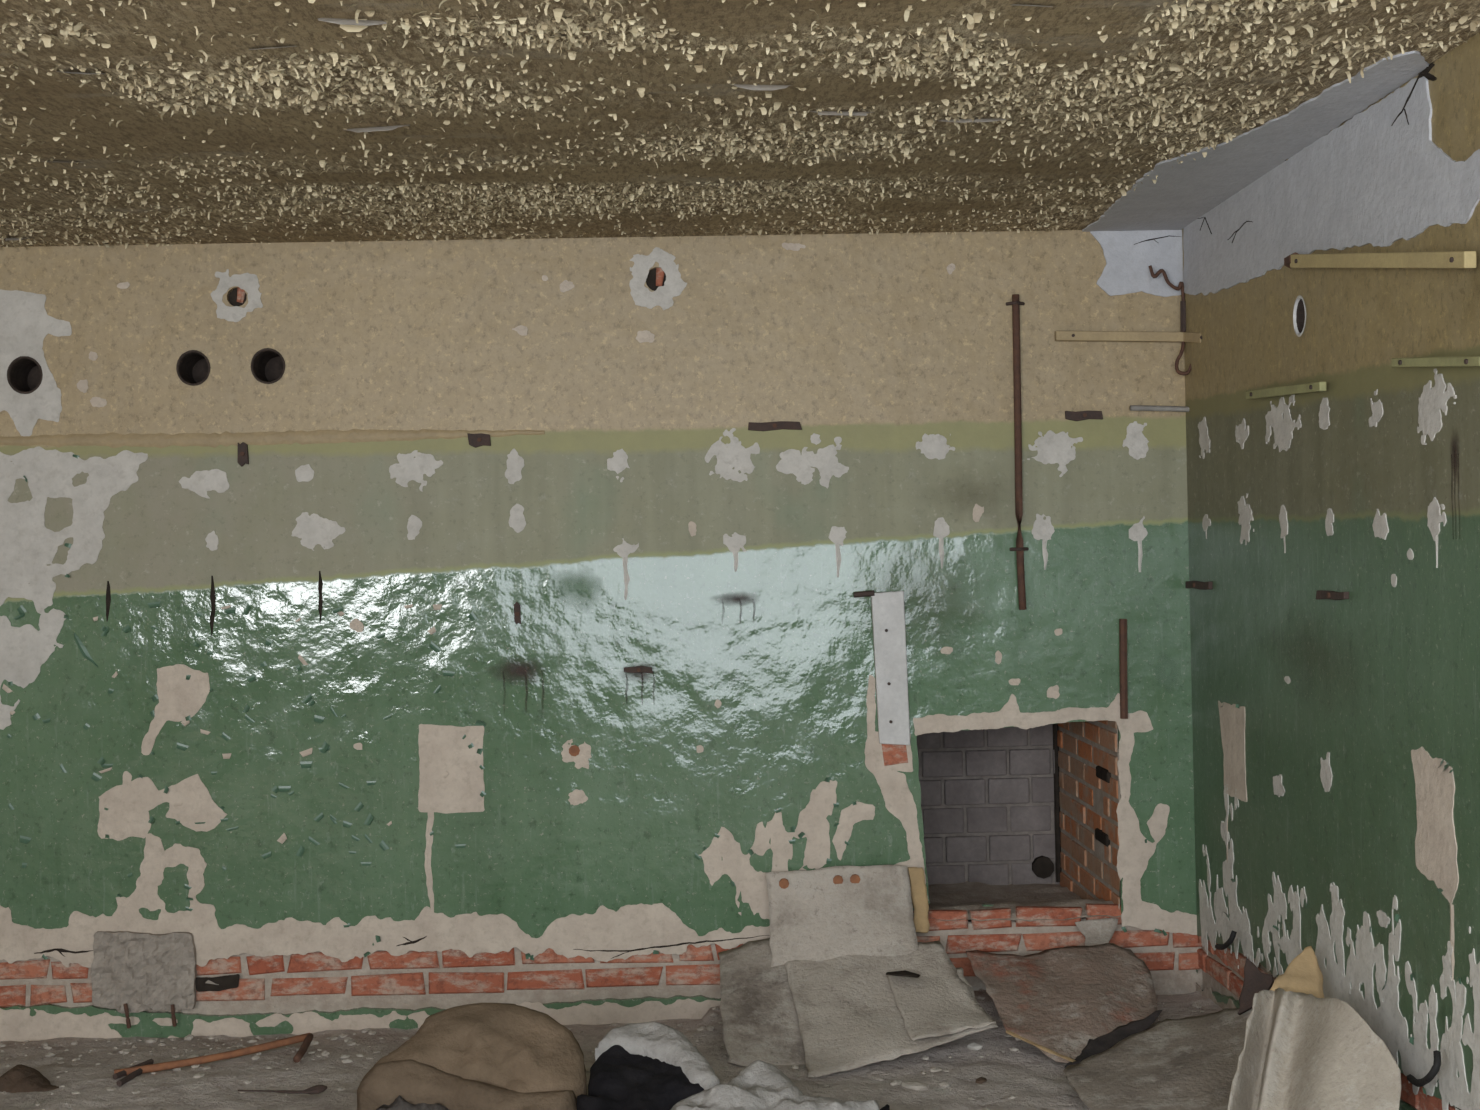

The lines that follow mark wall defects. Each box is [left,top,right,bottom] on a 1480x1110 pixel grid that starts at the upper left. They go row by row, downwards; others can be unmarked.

peeling [0,0,1480,310]
peeling [0,289,148,730]
corrosion [504,664,532,678]
peeling [0,664,1480,1110]